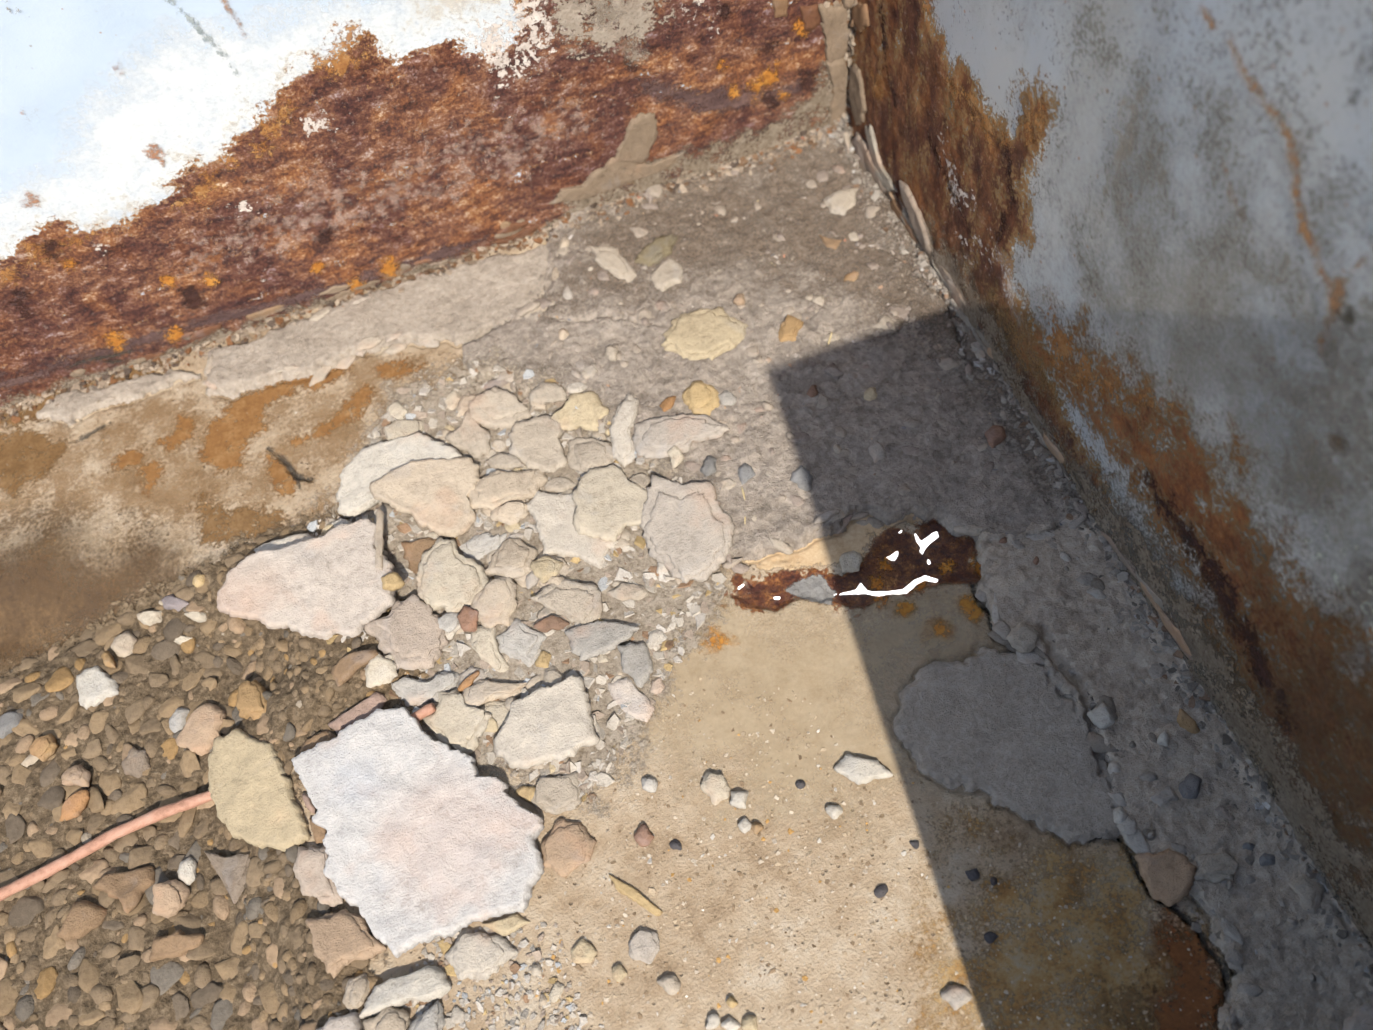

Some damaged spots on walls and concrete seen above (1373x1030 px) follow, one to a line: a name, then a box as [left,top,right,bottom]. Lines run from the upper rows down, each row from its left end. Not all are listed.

rust [0,0,835,1030]
rust [823,188,858,215]
rust [905,803,1231,1030]
rust [843,0,1373,937]